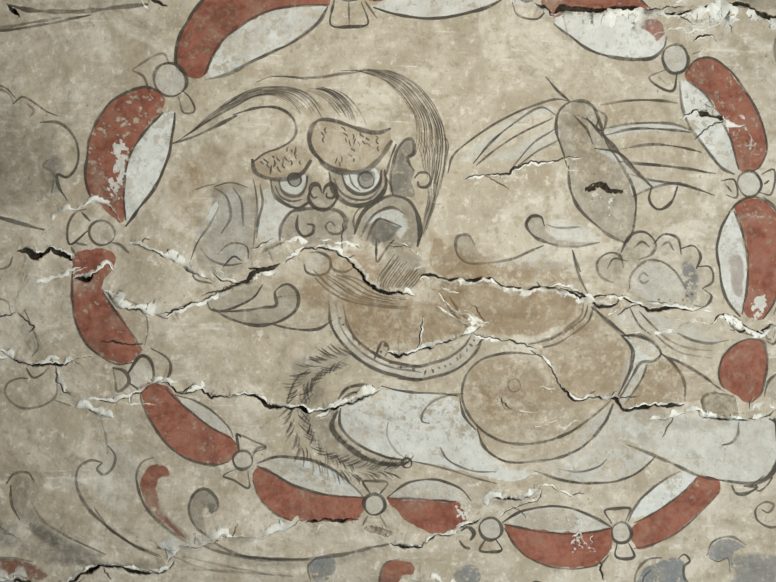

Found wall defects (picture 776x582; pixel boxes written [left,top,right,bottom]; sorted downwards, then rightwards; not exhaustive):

crack [141,0,167,10]
crack [534,0,776,42]
crack [680,103,757,150]
crack [51,196,122,223]
spalling [585,181,625,216]
crack [0,220,776,437]
crack [390,481,584,552]
crack [62,518,358,582]
crack [572,529,604,581]
crack [0,572,31,582]
crack [410,573,455,582]